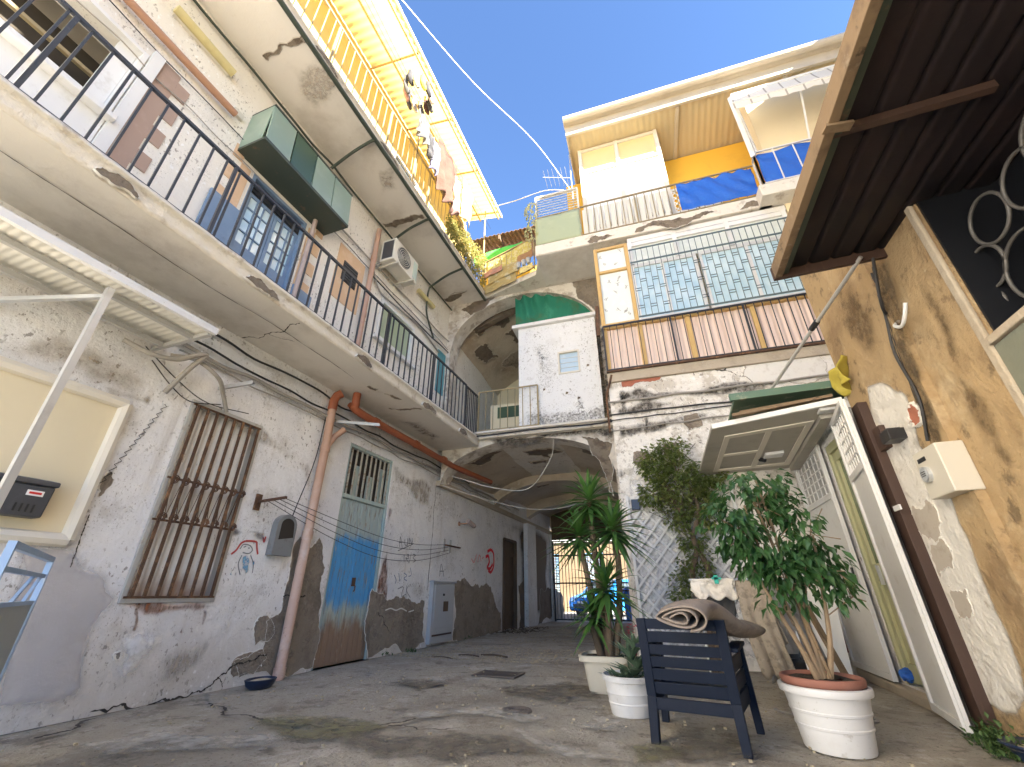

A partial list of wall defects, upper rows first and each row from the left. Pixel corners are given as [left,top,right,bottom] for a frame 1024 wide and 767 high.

spalling [262,35,339,80]
spalling [93,167,139,201]
spalling [634,211,719,233]
crack [1,151,352,377]
spalling [244,275,279,301]
flaking render [444,291,519,369]
spalling [905,401,923,428]
crack [70,514,90,567]
peeling [911,498,954,579]
spalling [229,536,301,679]
peeling [949,588,974,621]
crack [34,654,452,738]